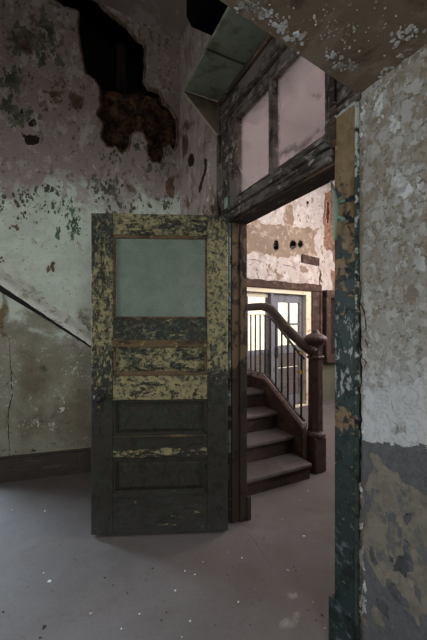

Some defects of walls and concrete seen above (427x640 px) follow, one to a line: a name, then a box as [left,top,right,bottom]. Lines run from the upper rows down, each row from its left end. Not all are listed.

peeling [5,8,65,68]
peeling [234,0,308,54]
peeling [303,4,358,72]
peeling [0,65,85,146]
flaking render [54,0,179,214]
flaking render [359,7,426,171]
peeling [0,184,81,243]
flaking render [247,184,335,291]
flaking render [362,172,425,241]
water stain [0,294,8,335]
crack [3,344,16,449]
flaking render [359,453,427,629]